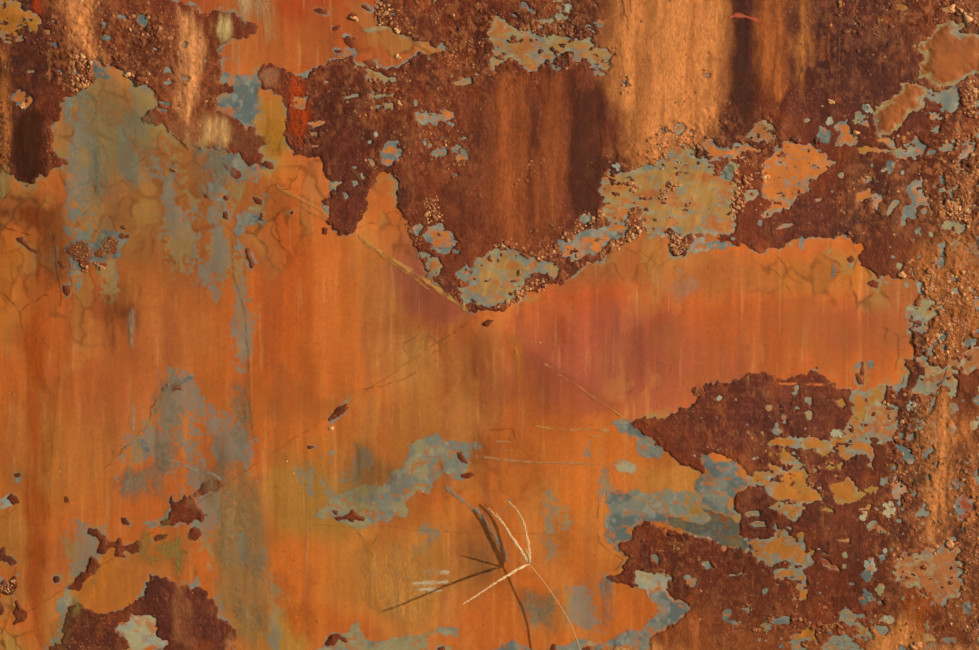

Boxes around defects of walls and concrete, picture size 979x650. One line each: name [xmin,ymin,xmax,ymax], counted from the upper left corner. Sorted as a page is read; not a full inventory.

rust [57,233,129,269]
rust [0,0,274,187]
peeling [206,153,267,258]
rust [245,248,255,269]
peeling [415,109,454,127]
peeling [410,223,460,278]
peeling [455,20,979,308]
peeling [603,173,979,601]
peeling [315,433,483,530]
rust [53,479,224,591]
rust [0,547,28,625]
rust [48,574,237,650]